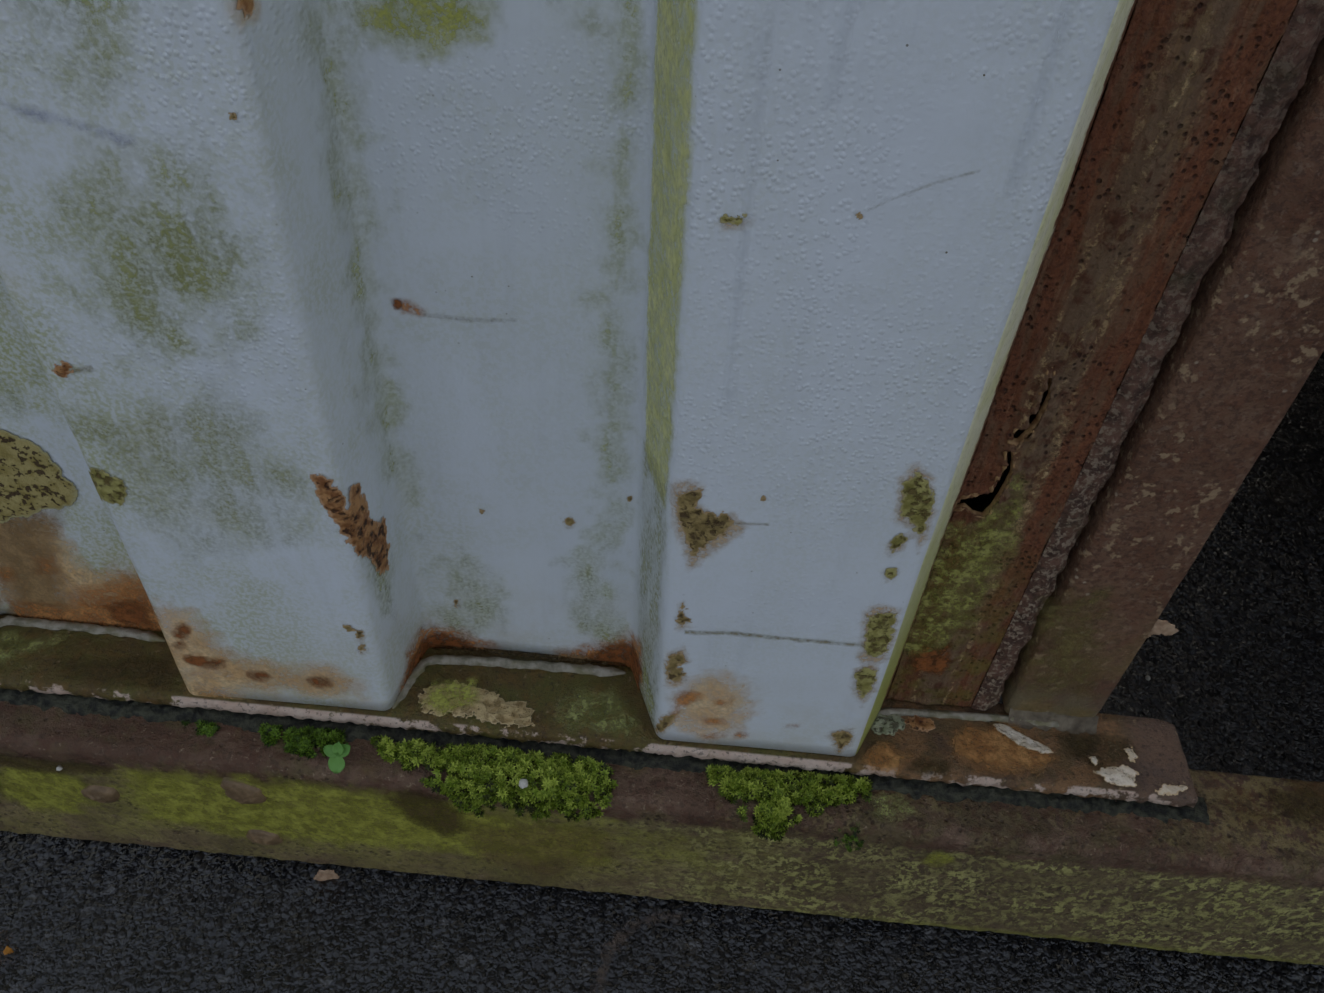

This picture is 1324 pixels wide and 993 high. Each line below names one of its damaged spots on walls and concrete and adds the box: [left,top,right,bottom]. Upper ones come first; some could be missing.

rust [236,0,254,18]
crack [954,367,1072,530]
rust [0,430,346,699]